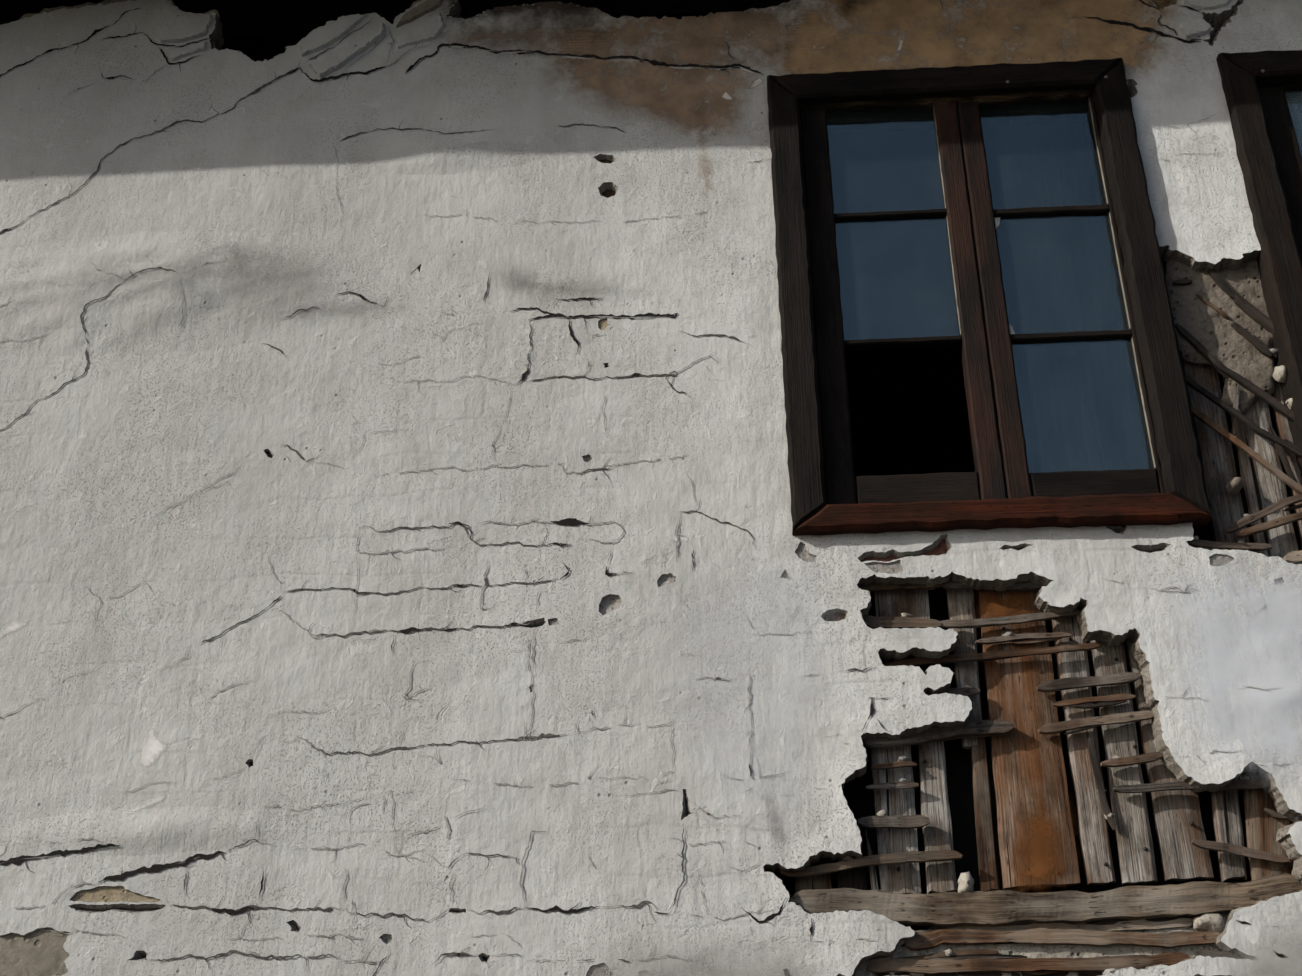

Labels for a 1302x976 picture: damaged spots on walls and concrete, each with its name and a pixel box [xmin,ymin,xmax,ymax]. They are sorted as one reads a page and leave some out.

flaking render [147,1,214,61]
flaking render [300,0,443,78]
crack [0,8,764,233]
leakage [449,0,788,129]
crack [1066,0,1202,54]
flaking render [1149,0,1231,40]
crack [0,246,224,431]
flaking render [1166,258,1302,566]
crack [0,274,875,976]
flaking render [781,539,1302,976]
peeling [0,929,69,976]
peeling [72,887,160,911]